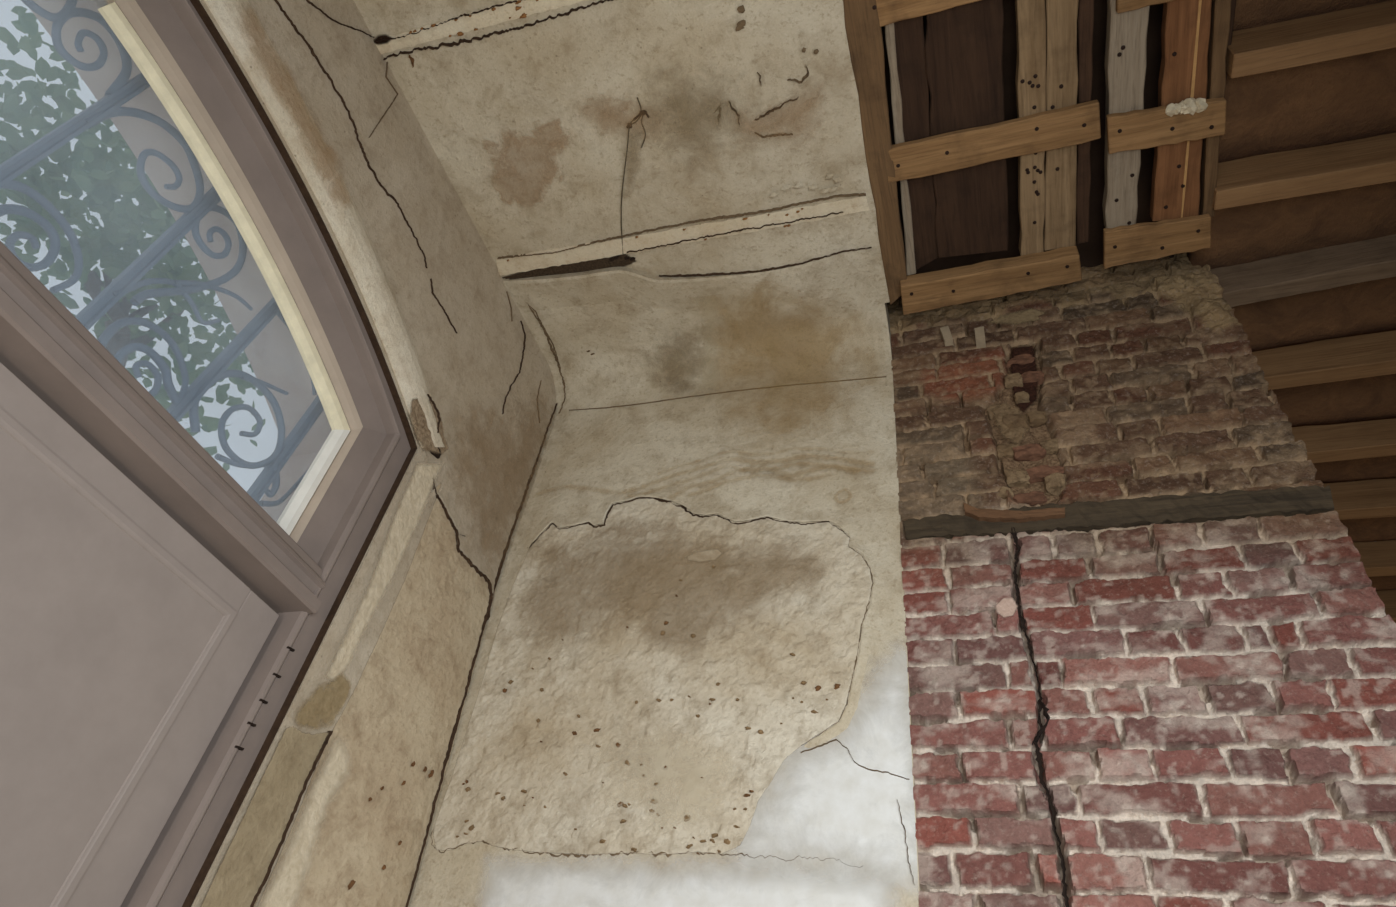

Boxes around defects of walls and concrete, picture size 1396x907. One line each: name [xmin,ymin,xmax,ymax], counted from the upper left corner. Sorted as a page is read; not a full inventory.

crack [274,0,457,334]
spalling [736,5,746,31]
spalling [258,464,885,907]
crack [1011,527,1069,907]